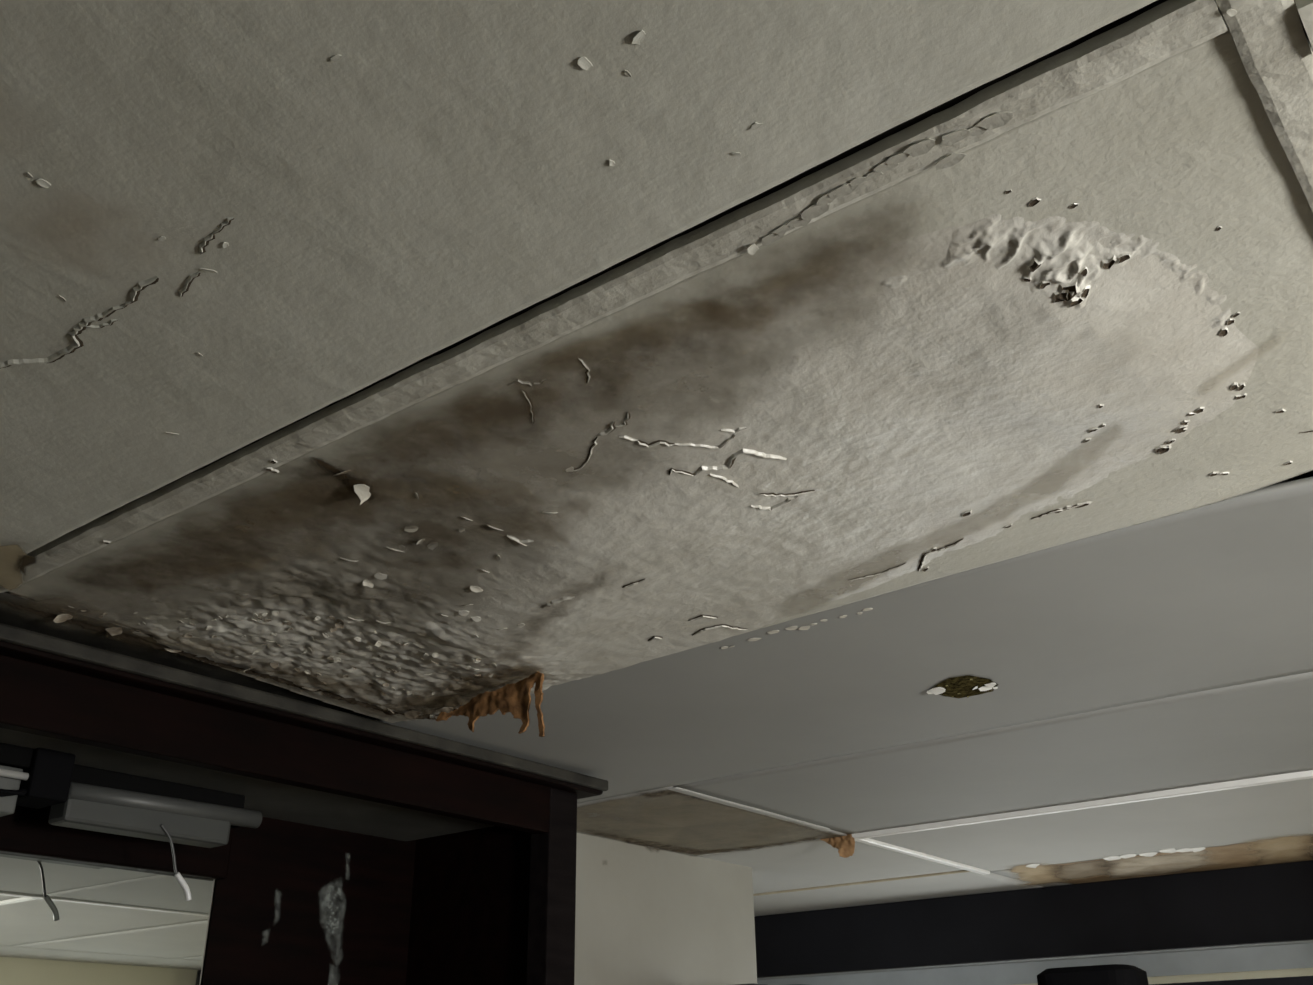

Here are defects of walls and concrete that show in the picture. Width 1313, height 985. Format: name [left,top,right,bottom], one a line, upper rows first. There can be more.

peeling [632,30,645,45]
peeling [578,57,593,70]
peeling [26,172,51,188]
spalling [879,197,1240,337]
damp [122,404,616,625]
peeling [0,545,36,590]
damp [577,790,837,855]